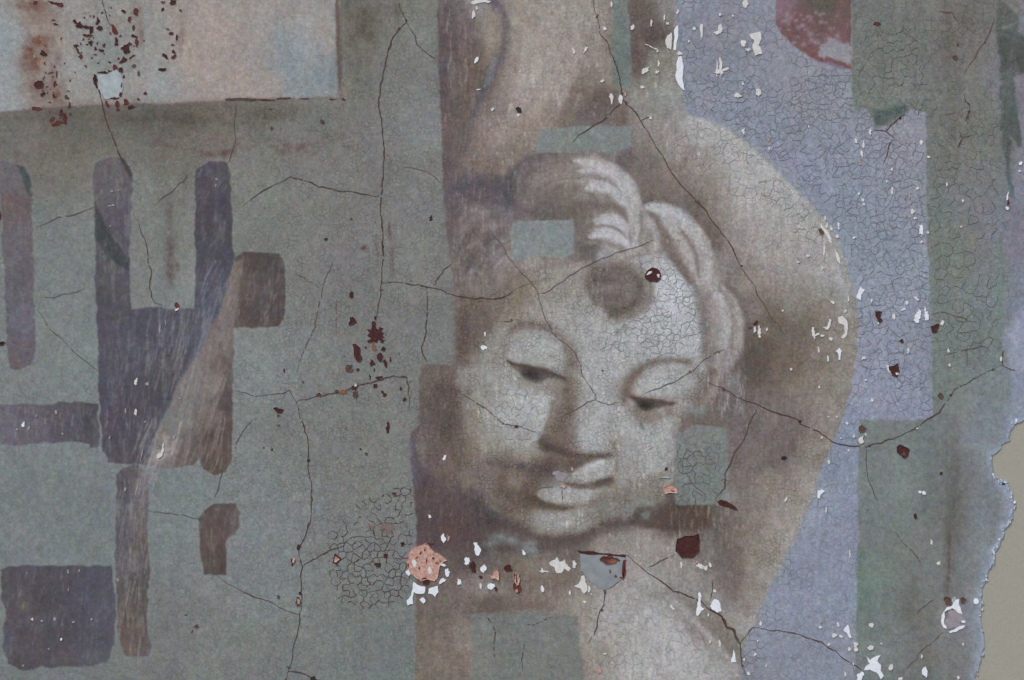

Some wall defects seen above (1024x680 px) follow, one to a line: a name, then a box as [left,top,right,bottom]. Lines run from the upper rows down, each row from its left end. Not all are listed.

peeling [640,0,749,90]
crack [100,96,129,172]
crack [576,0,783,334]
crack [875,114,906,164]
peeling [811,287,944,361]
crack [642,346,1016,499]
crack [218,265,410,680]
peeling [400,533,462,605]
peeling [539,550,626,603]
crack [589,554,866,675]
peeling [819,621,903,680]
peeling [941,419,1024,680]